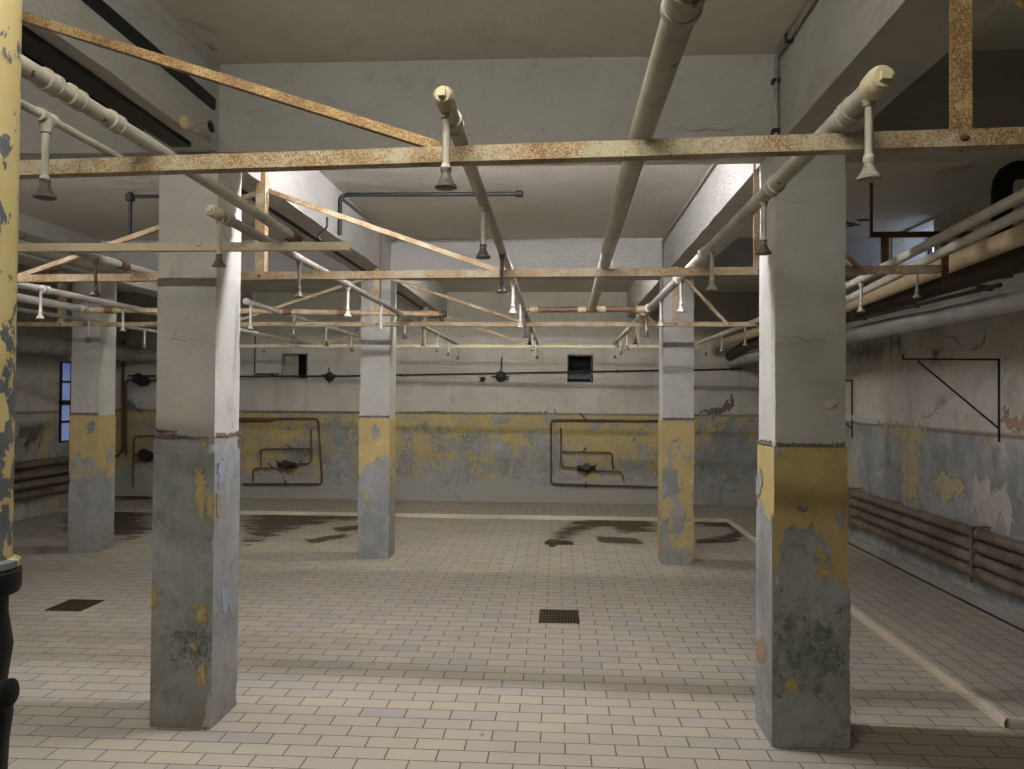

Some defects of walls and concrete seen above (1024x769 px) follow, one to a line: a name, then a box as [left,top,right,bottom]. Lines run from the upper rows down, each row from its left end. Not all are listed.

peeling [70,412,99,434]
peeling [156,429,242,448]
damp [114,496,152,539]
peeling [193,459,225,519]
peeling [243,409,562,559]
damp [548,520,654,547]
peeling [884,419,1015,537]
peeling [661,393,851,749]
peeling [161,580,234,729]